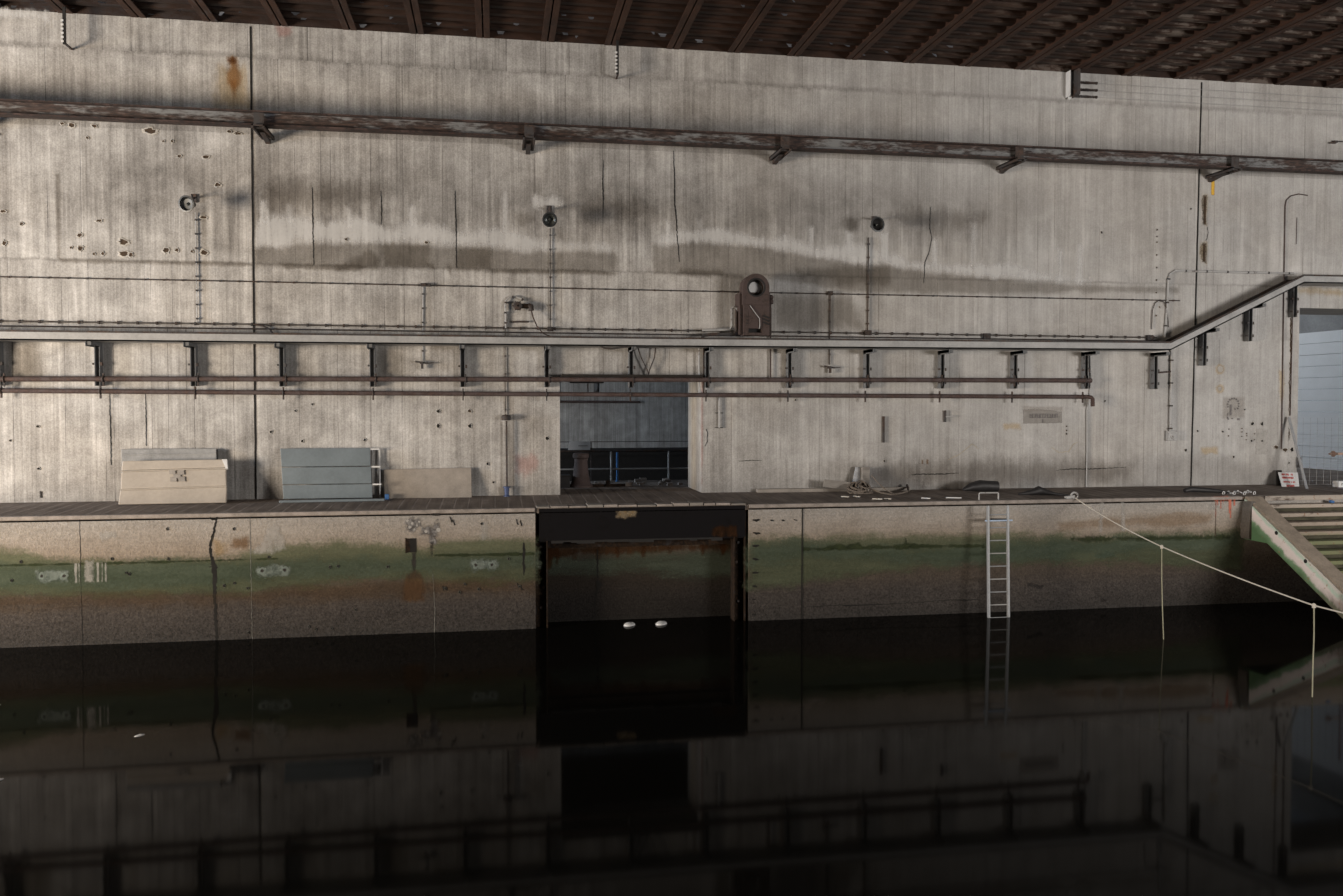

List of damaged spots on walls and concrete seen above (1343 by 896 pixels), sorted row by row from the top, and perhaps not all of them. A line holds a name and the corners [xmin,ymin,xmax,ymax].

rust [227,56,241,91]
crack [209,517,218,640]